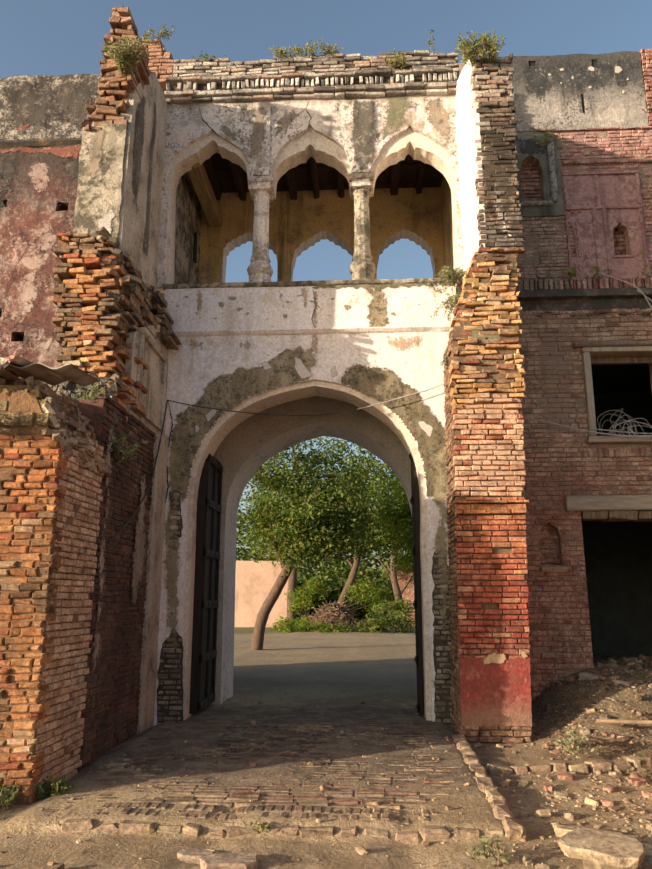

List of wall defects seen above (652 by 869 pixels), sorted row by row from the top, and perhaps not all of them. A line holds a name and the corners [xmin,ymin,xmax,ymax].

leakage [2,75,98,132]
spalling [0,129,105,192]
leakage [350,99,378,170]
peeling [41,222,56,250]
peeling [19,272,39,312]
peeling [169,346,316,539]
peeling [331,364,448,497]
spalling [157,629,184,725]
peeling [484,653,506,665]